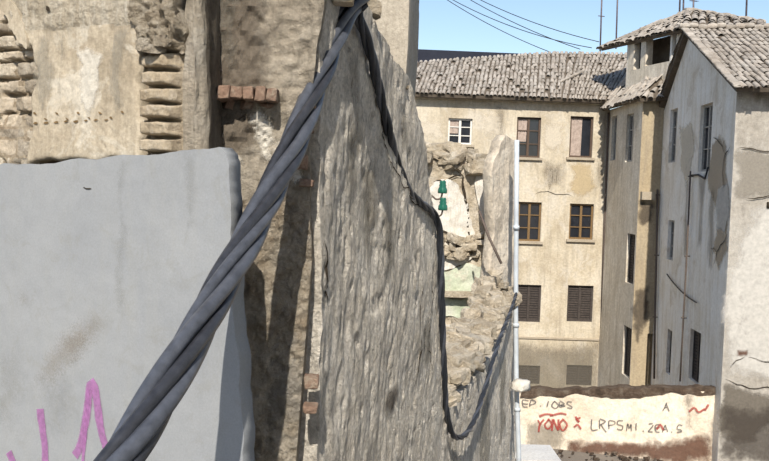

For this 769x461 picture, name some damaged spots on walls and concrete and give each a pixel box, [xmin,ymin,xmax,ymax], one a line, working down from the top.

peeling [0,0,33,50]
spalling [127,0,189,55]
peeling [33,49,112,124]
peeling [708,139,729,266]
peeling [444,257,481,327]
damp [386,389,398,408]
crack [729,357,769,389]
damp [723,409,769,460]